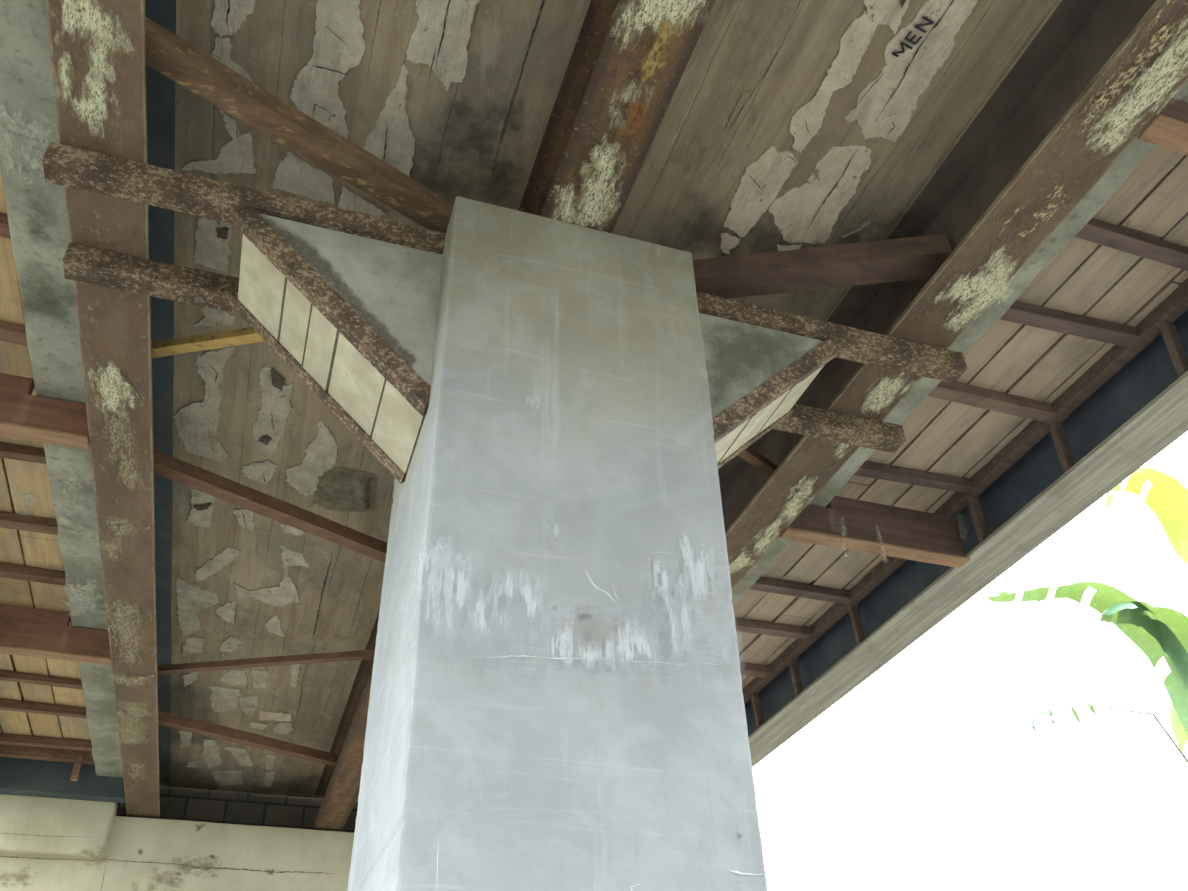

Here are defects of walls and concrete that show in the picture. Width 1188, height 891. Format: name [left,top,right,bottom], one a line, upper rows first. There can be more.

efflorescence [57,0,131,133]
peeling [290,0,366,139]
peeling [273,150,387,217]
peeling [363,0,480,177]
corrosion [642,20,677,81]
peeling [720,0,977,255]
efflorescence [1087,19,1188,153]
efflorescence [935,247,1016,331]
efflorescence [89,363,141,487]
peeling [241,365,339,496]
peeling [175,523,311,654]
leakage [579,534,714,665]